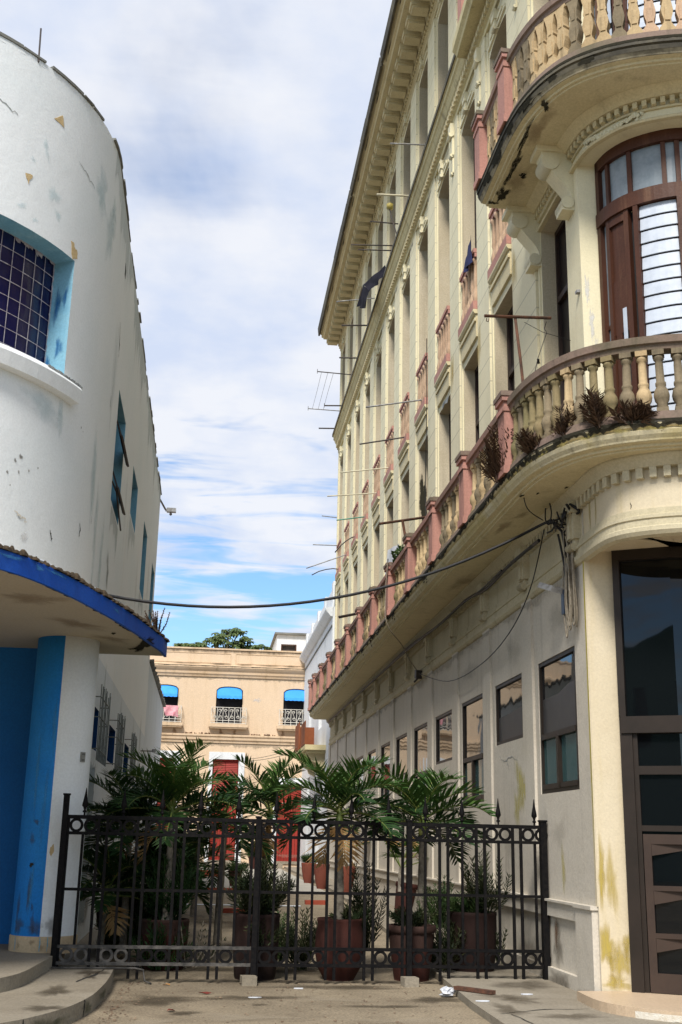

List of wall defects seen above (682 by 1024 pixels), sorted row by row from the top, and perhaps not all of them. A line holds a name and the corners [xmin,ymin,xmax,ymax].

water stain [599,852,614,897]
water stain [601,930,630,988]